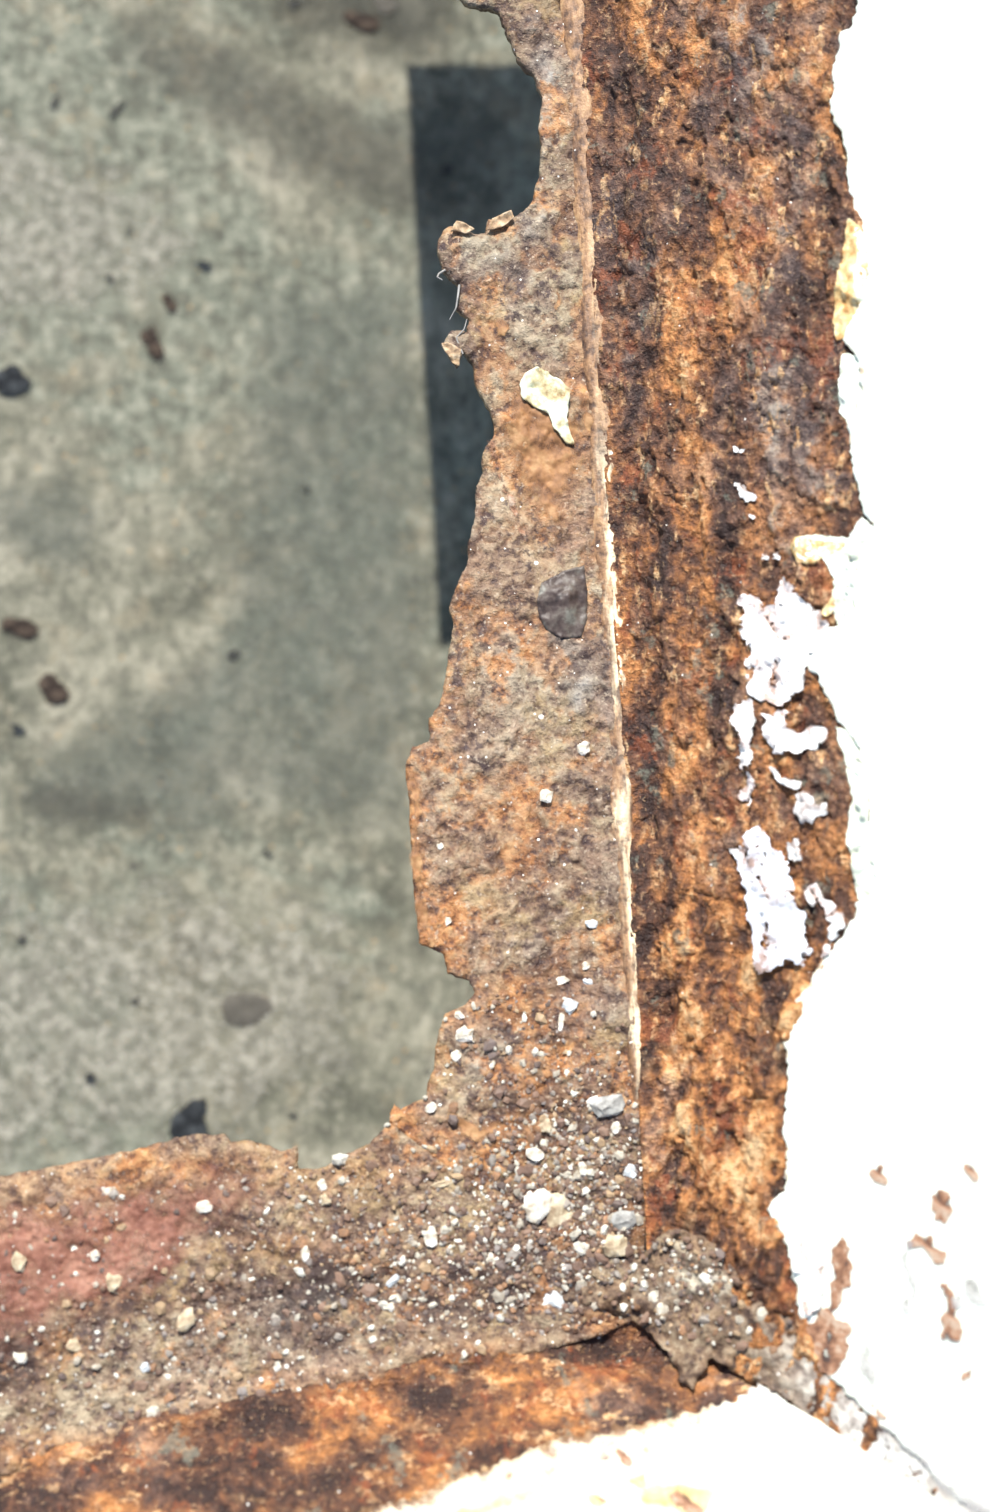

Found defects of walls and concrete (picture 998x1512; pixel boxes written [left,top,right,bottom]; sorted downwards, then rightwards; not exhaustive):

corrosion [488,393,594,540]
peeling [734,482,757,519]
corrosion [537,565,588,639]
corrosion [580,0,873,1434]
peeling [729,517,876,974]
corrosion [869,1164,888,1186]
corrosion [963,1163,979,1182]
corrosion [0,1189,231,1337]
corrosion [902,1189,957,1313]
corrosion [940,1275,988,1341]
corrosion [0,1314,767,1512]
corrosion [858,1348,888,1452]